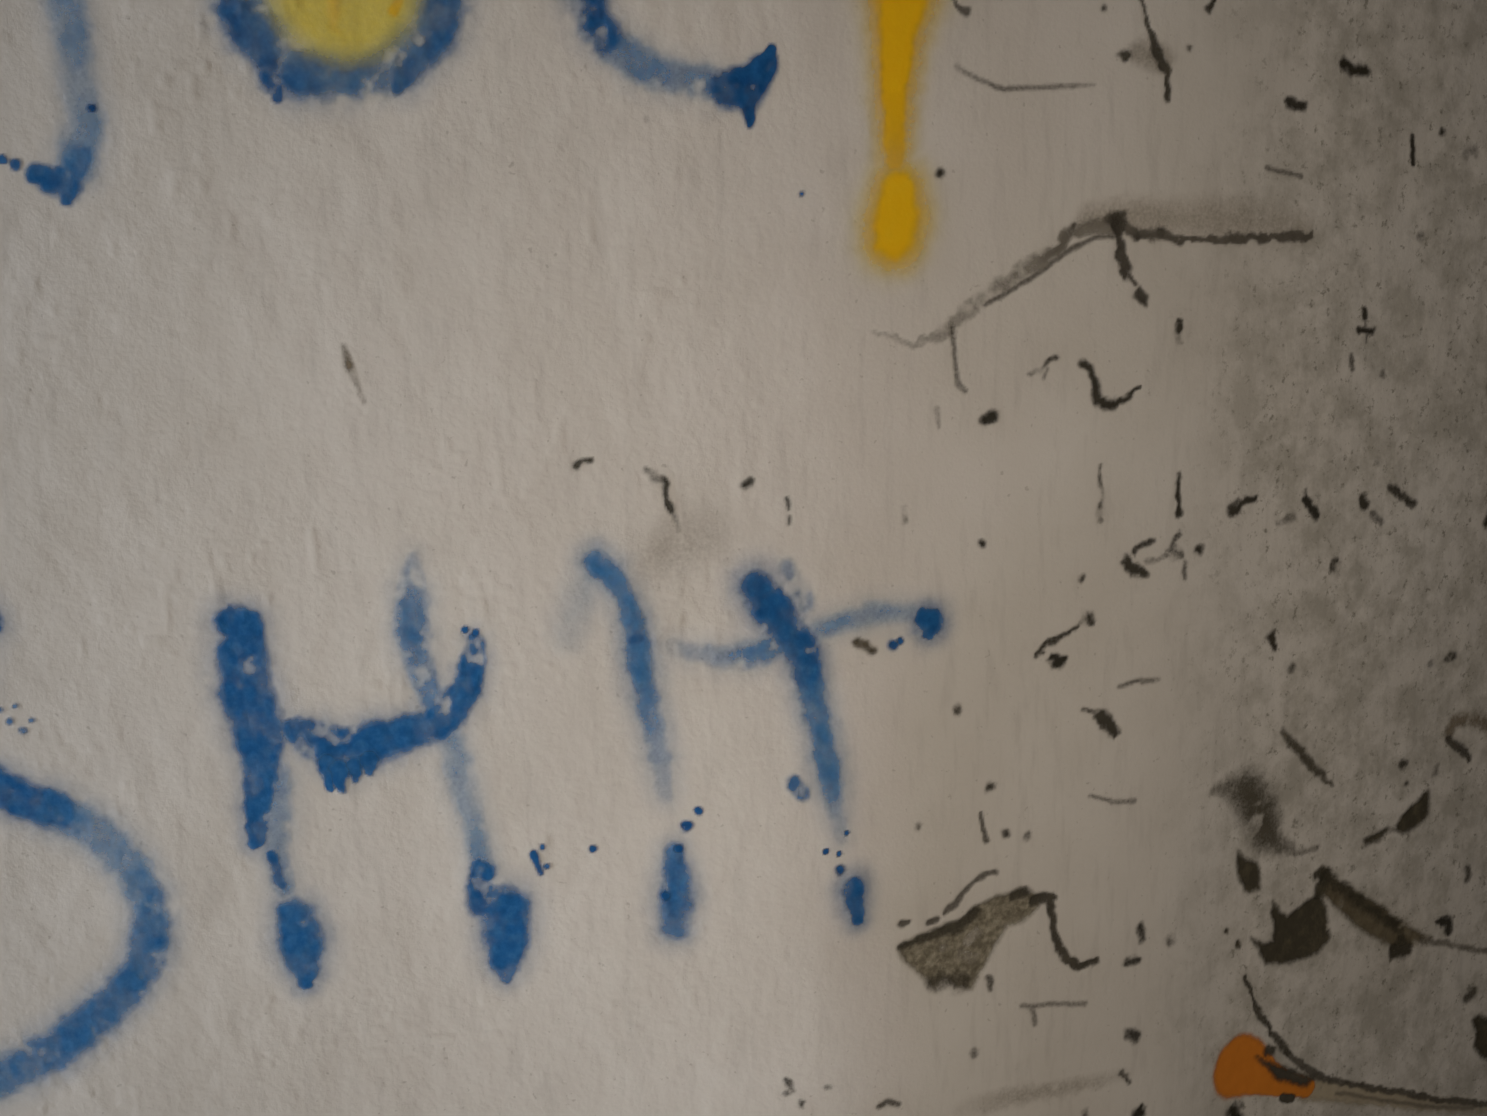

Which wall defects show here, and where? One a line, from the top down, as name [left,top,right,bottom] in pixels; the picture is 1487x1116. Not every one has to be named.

crack [951,212,1313,392]
peeling [1220,772,1292,893]
spalling [898,870,1099,990]
peeling [1224,868,1487,964]
peeling [1464,988,1487,1058]